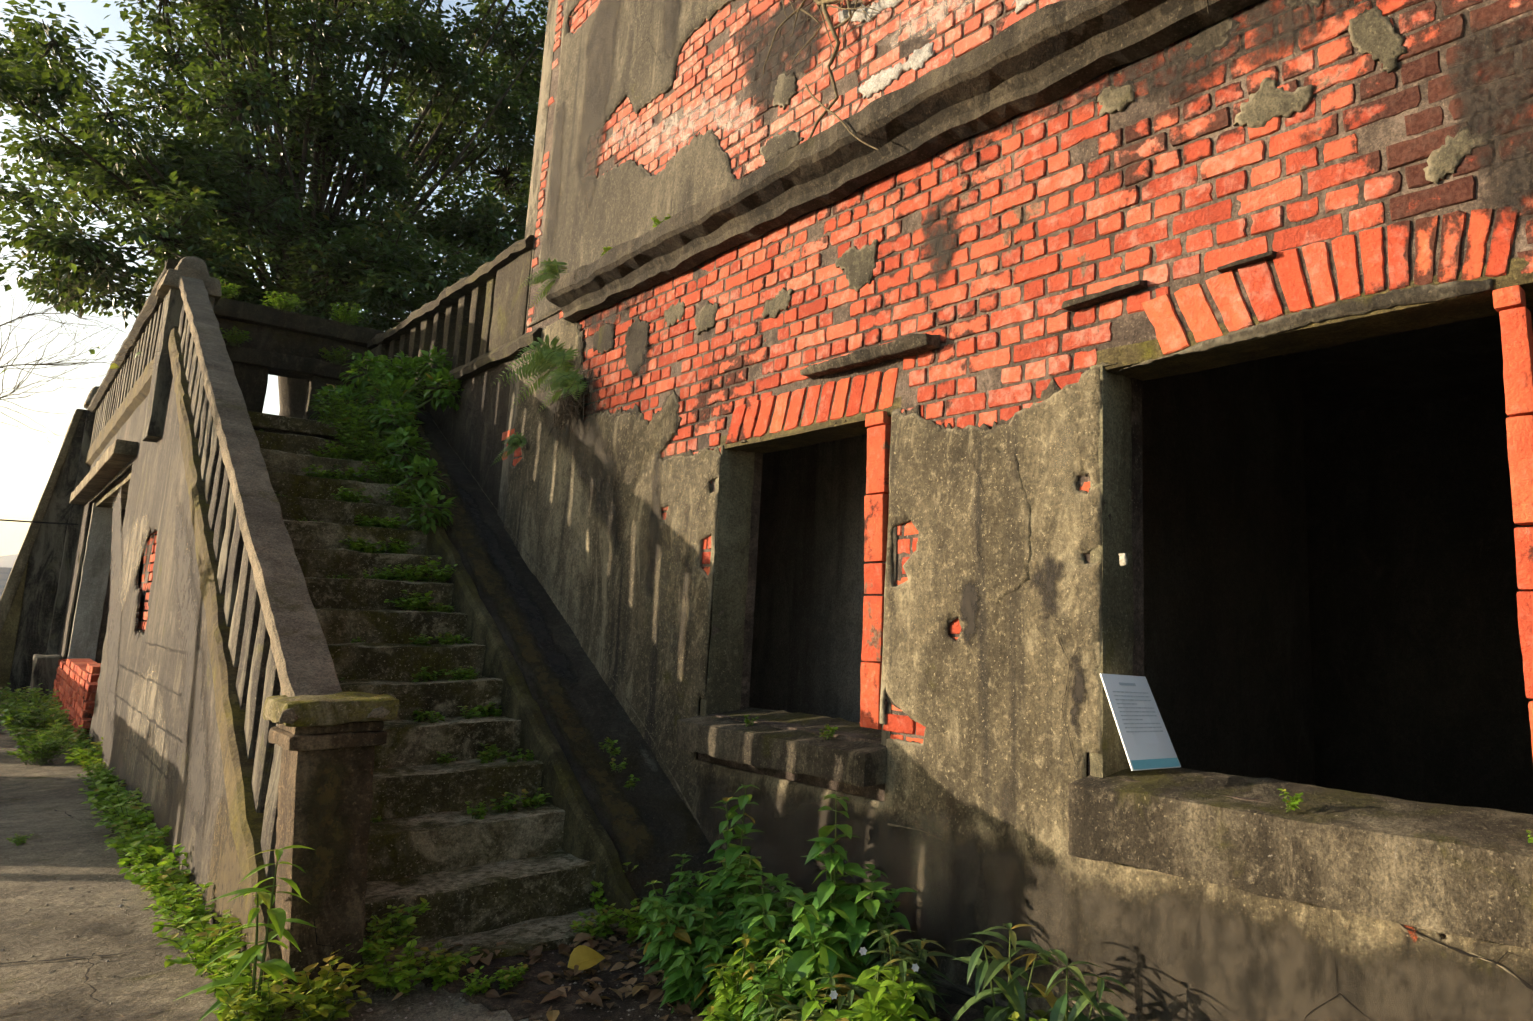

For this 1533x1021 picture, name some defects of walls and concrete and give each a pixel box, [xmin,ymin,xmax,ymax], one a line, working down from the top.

flaking render [552,0,1533,458]
flaking render [897,521,918,585]
leakage [960,581,979,645]
leakage [1031,555,1064,617]
leakage [1070,656,1085,735]
crack [1397,923,1533,990]